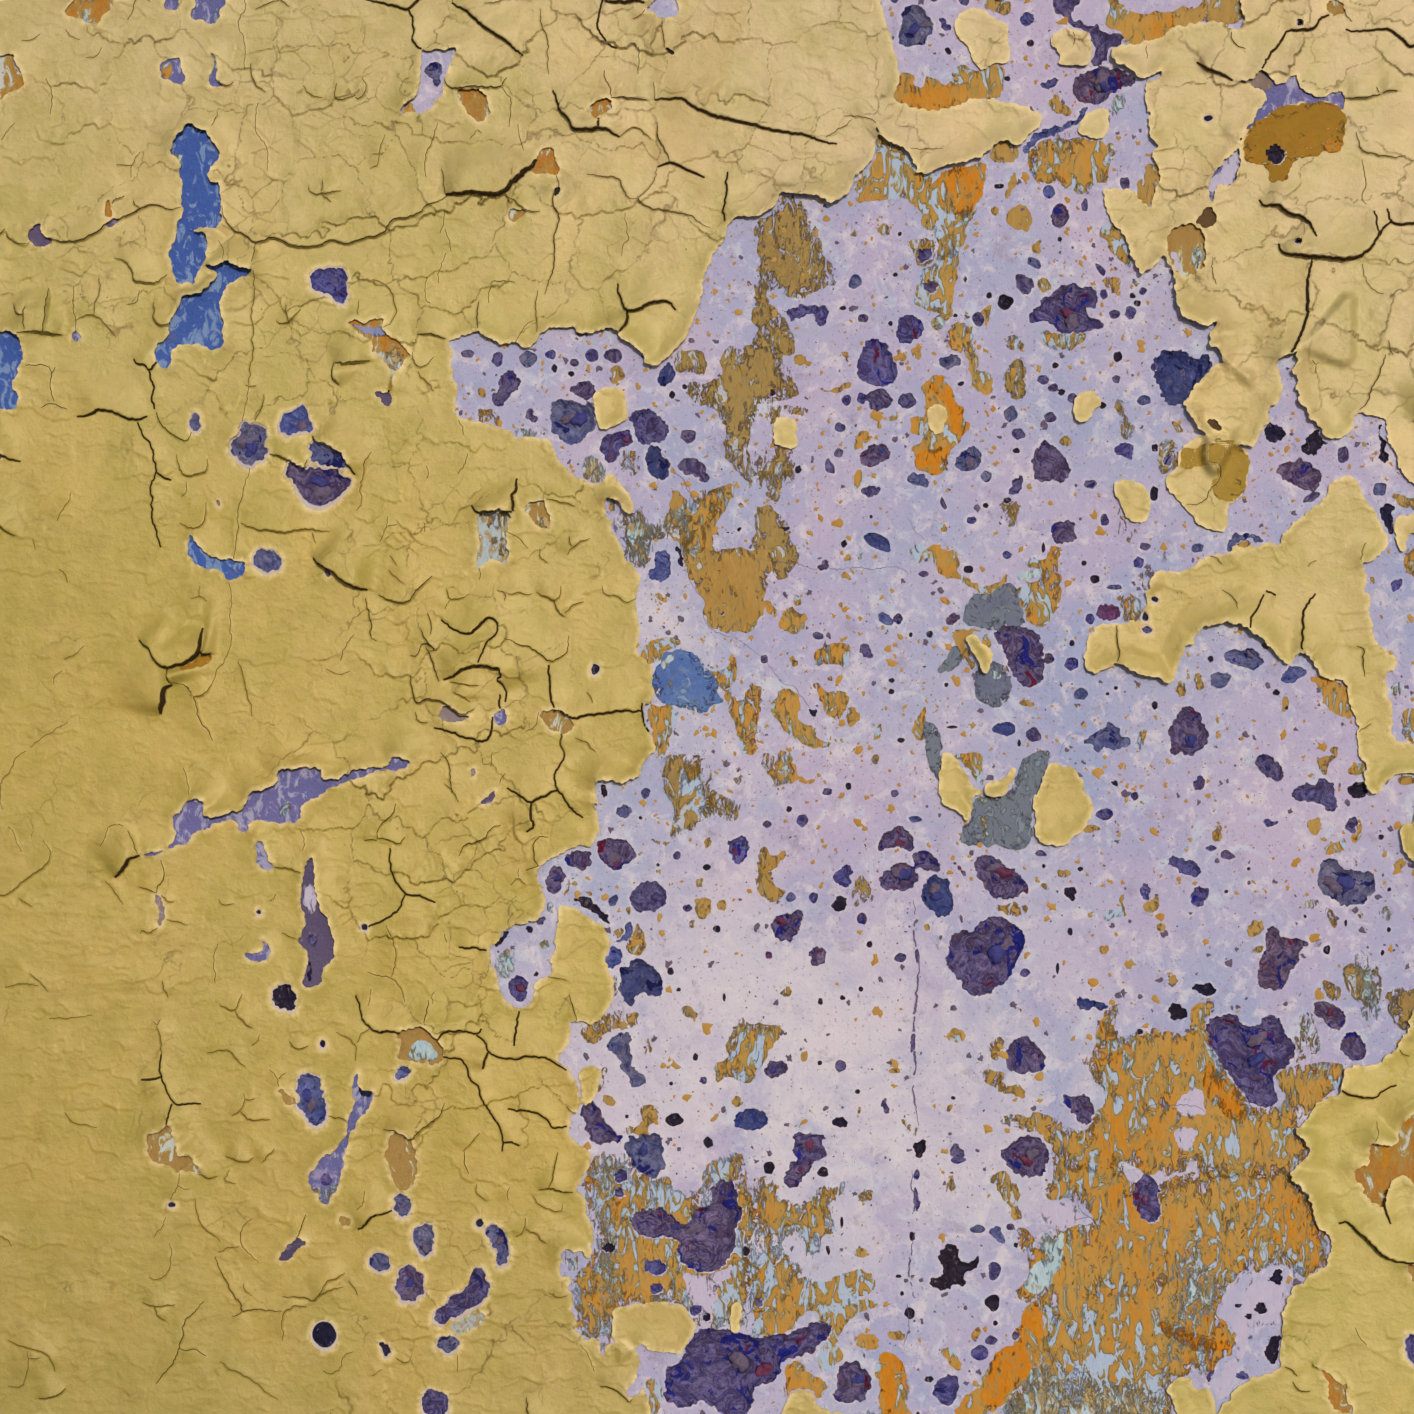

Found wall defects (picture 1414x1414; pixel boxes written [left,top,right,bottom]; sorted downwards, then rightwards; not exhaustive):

crack [1197,10,1414,81]
peeling [12,208,69,263]
peeling [89,185,137,244]
peeling [138,0,271,385]
crack [211,0,876,424]
crack [1259,87,1414,371]
peeling [0,315,41,485]
crack [0,152,649,907]
peeling [308,0,1414,1414]
crack [100,824,185,934]
peeling [126,741,428,1014]
crack [141,804,575,1400]